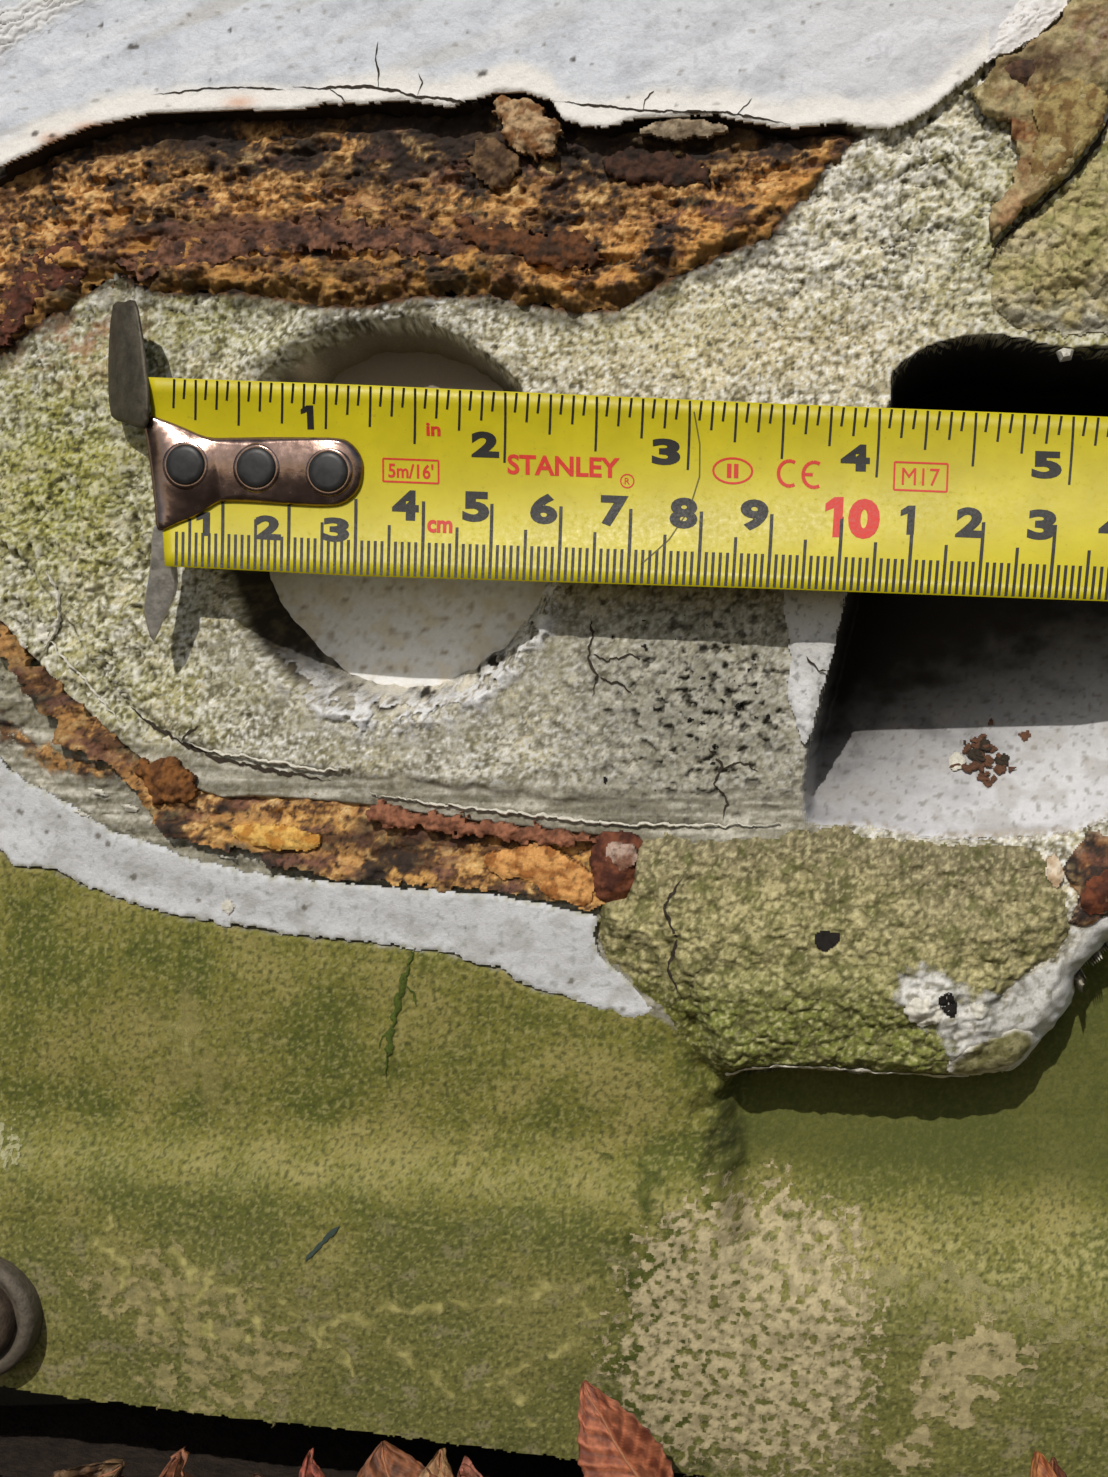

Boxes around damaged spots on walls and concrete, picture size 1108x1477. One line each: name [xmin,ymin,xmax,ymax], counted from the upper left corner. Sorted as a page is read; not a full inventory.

spalling [972,0,1108,240]
rust [0,94,855,356]
spalling [1056,348,1074,362]
peeling [777,589,846,744]
peeling [189,743,348,773]
rust [0,621,643,911]
peeling [370,792,780,828]
spalling [815,931,840,952]
rust [1045,829,1108,926]
crack [379,947,416,1075]
spalling [898,948,1064,1075]
water stain [66,1161,1108,1477]